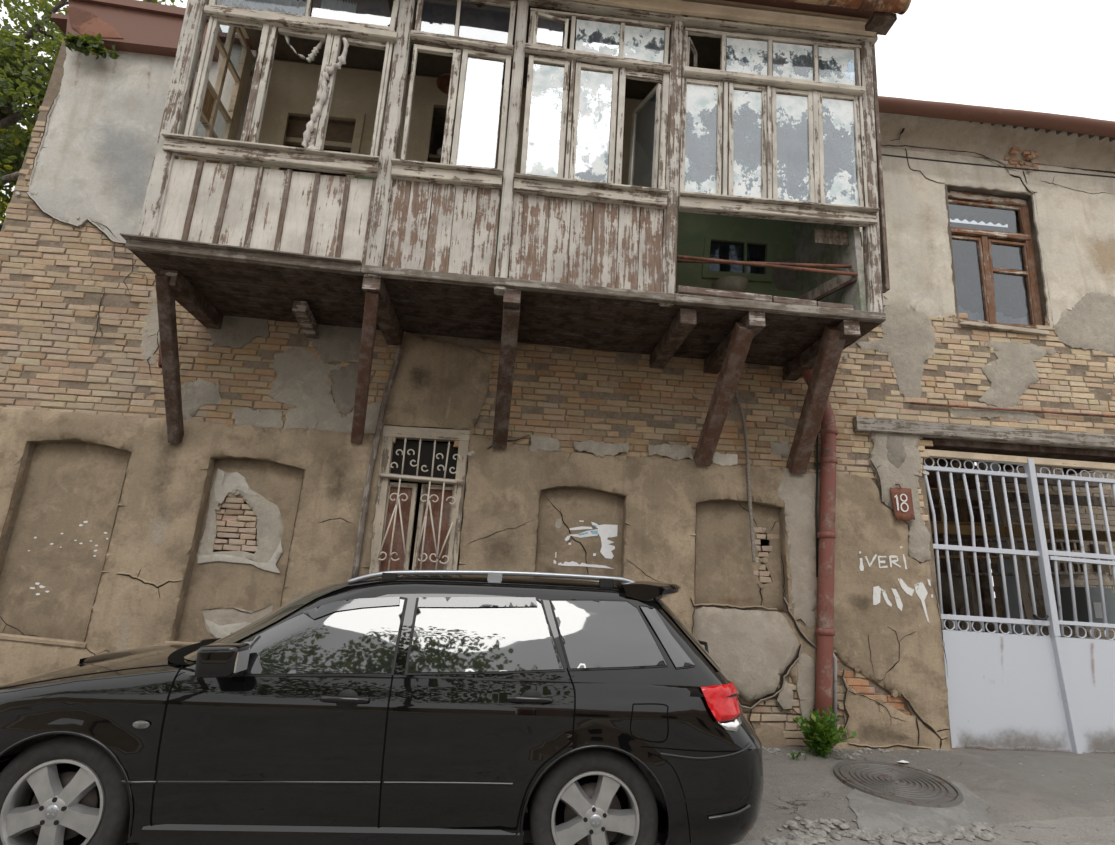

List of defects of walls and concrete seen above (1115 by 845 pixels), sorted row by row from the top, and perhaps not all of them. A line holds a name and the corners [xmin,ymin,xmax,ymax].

crack [881,128,1111,194]
spalling [0,106,166,418]
spalling [175,300,398,428]
spalling [507,343,720,459]
spalling [715,363,808,470]
spalling [829,313,1115,479]
flaking render [196,469,284,573]
crack [547,498,589,575]
spalling [753,527,779,588]
spalling [917,437,933,525]
crack [690,555,816,732]
crack [842,584,950,749]